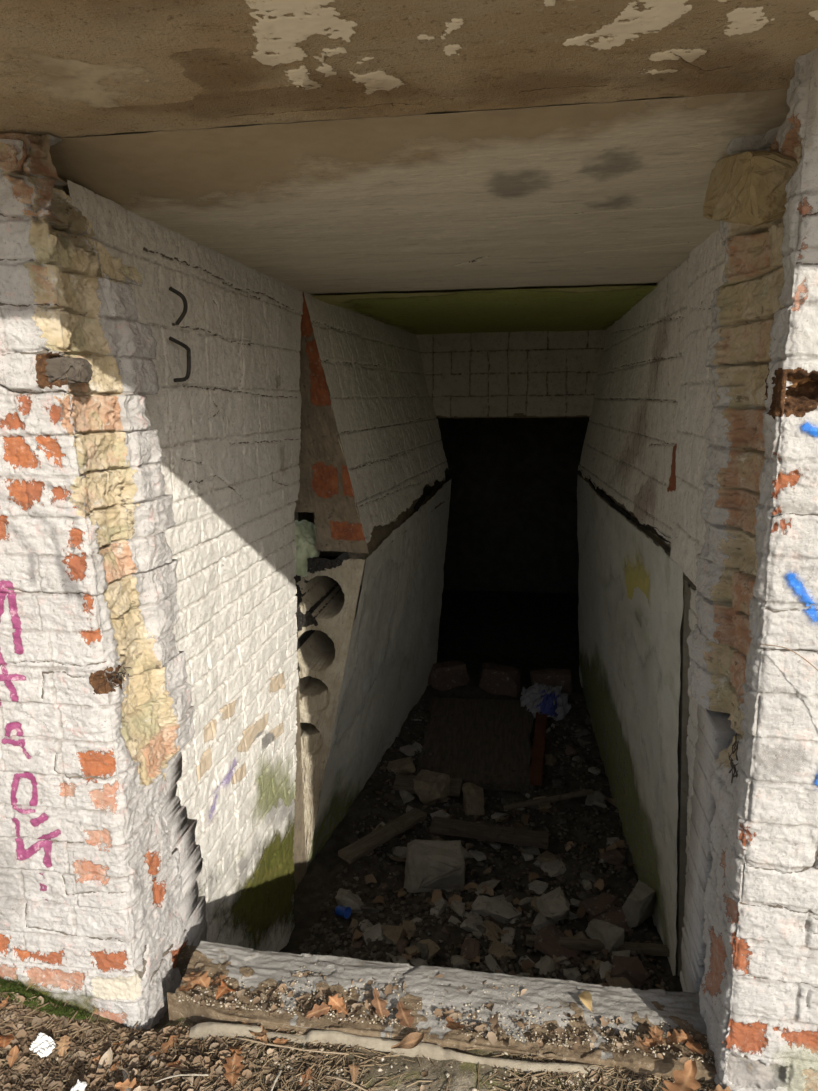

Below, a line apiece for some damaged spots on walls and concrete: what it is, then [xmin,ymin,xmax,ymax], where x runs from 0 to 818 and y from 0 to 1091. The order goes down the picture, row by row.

peeling [245,0,404,95]
peeling [562,0,692,50]
peeling [638,48,707,75]
peeling [718,0,775,36]
leakage [49,101,647,205]
spalling [0,133,180,814]
crack [361,469,448,511]
spalling [701,216,818,768]
peeling [72,858,110,886]
peeling [701,848,755,1005]
peeling [0,934,142,1024]
peeling [722,1018,818,1091]